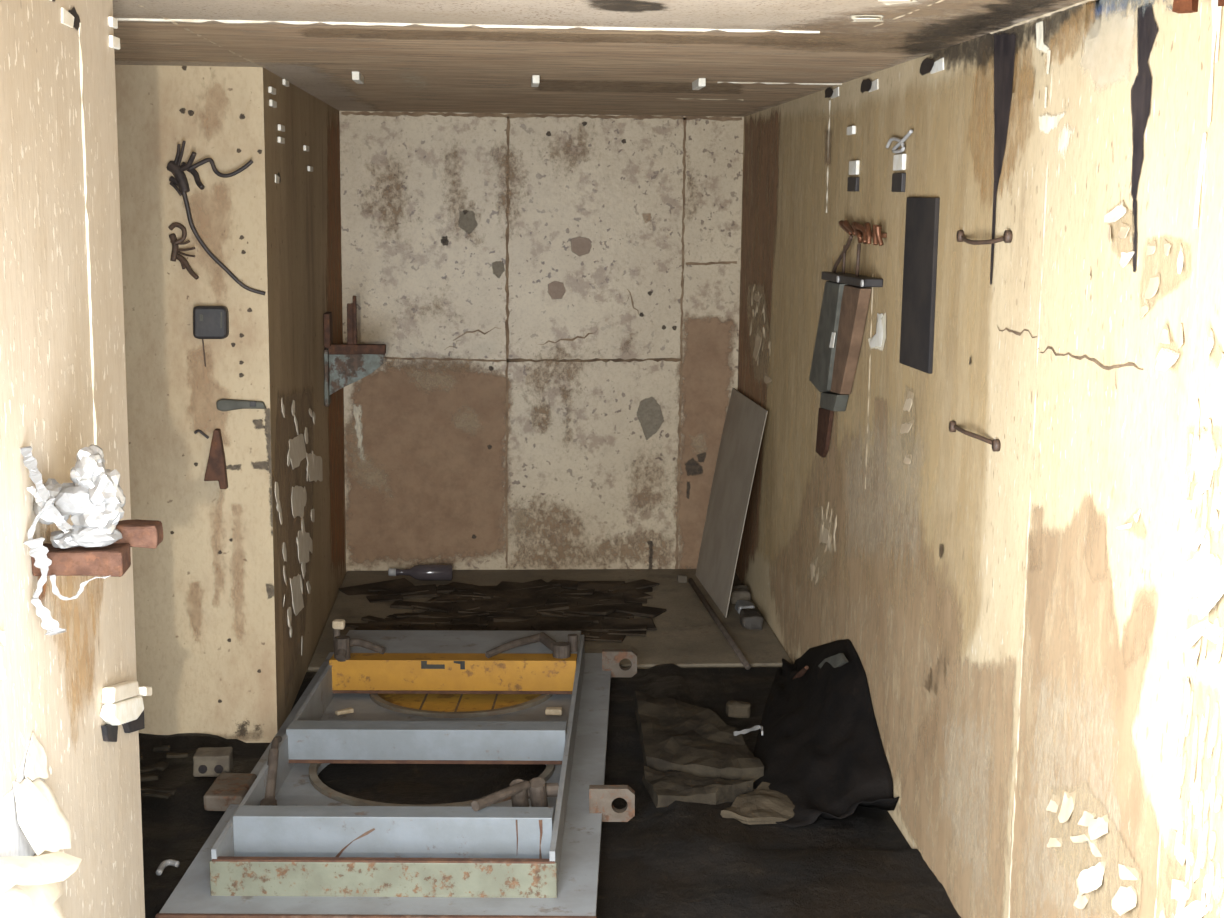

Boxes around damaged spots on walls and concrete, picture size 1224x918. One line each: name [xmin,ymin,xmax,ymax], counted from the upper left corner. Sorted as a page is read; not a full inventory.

leakage [1082,0,1172,272]
leakage [1193,0,1221,228]
peeling [226,390,323,697]
leakage [114,0,1085,918]
crack [997,326,1143,386]
peeling [1104,200,1189,318]
peeling [1155,323,1183,371]
leakage [1010,497,1188,918]
peeling [1159,399,1224,918]
peeling [0,732,82,918]
peeling [1046,784,1141,916]